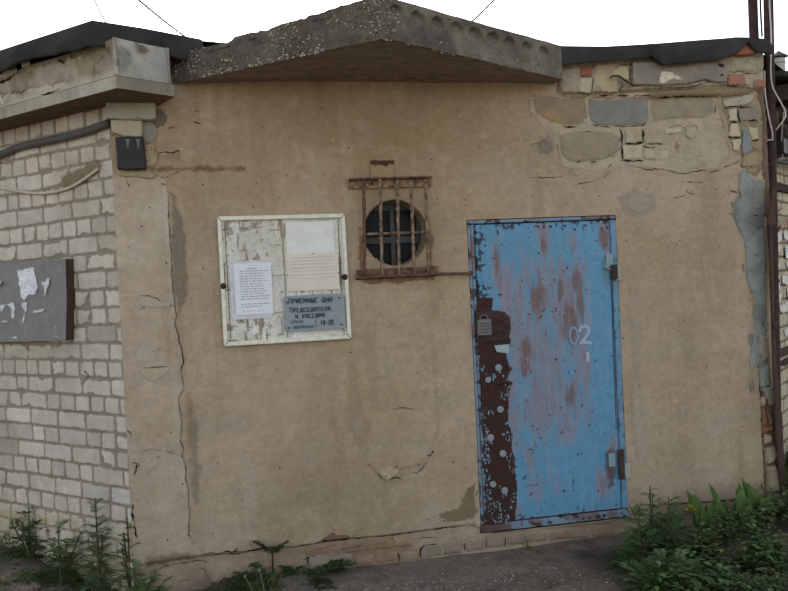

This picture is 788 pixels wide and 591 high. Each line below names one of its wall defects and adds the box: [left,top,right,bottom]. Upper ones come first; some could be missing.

peeling [0,54,103,105]
spalling [530,65,766,176]
corrosion [475,297,493,312]
crack [131,149,476,587]
corrosion [477,338,517,524]
corrosion [606,450,614,488]